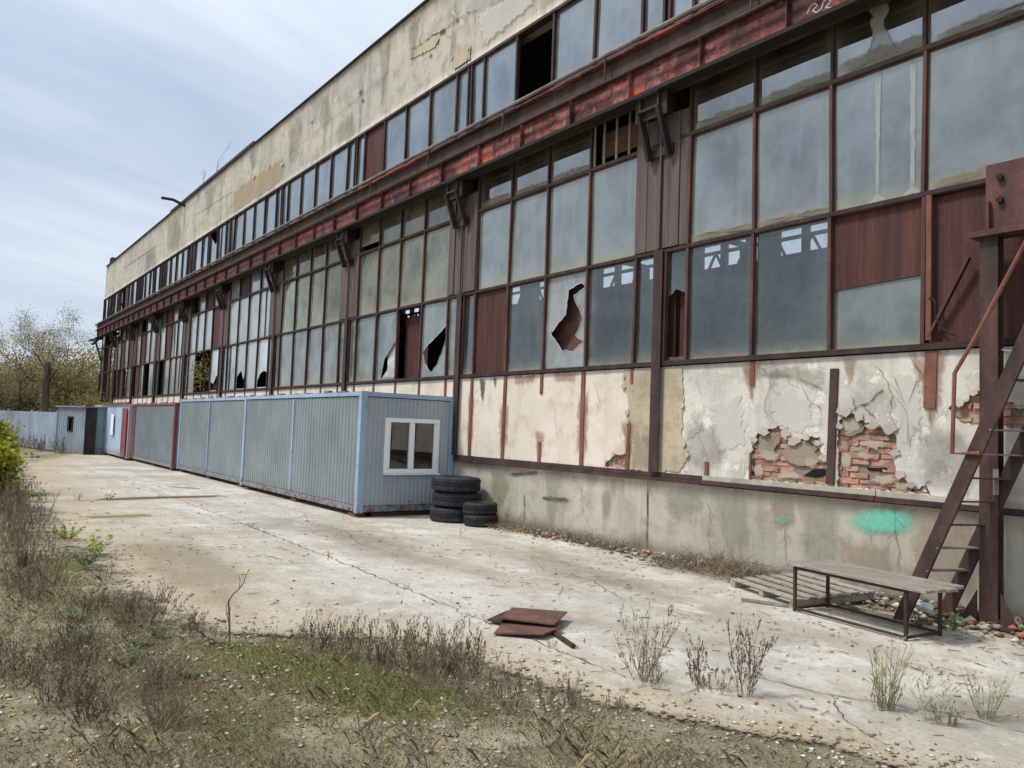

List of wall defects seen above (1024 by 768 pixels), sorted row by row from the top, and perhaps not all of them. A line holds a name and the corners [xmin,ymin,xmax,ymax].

flaking render [234,160,283,211]
crack [852,366,906,424]
flaking render [956,390,979,426]
flaking render [1004,402,1024,429]
flaking render [750,407,928,494]